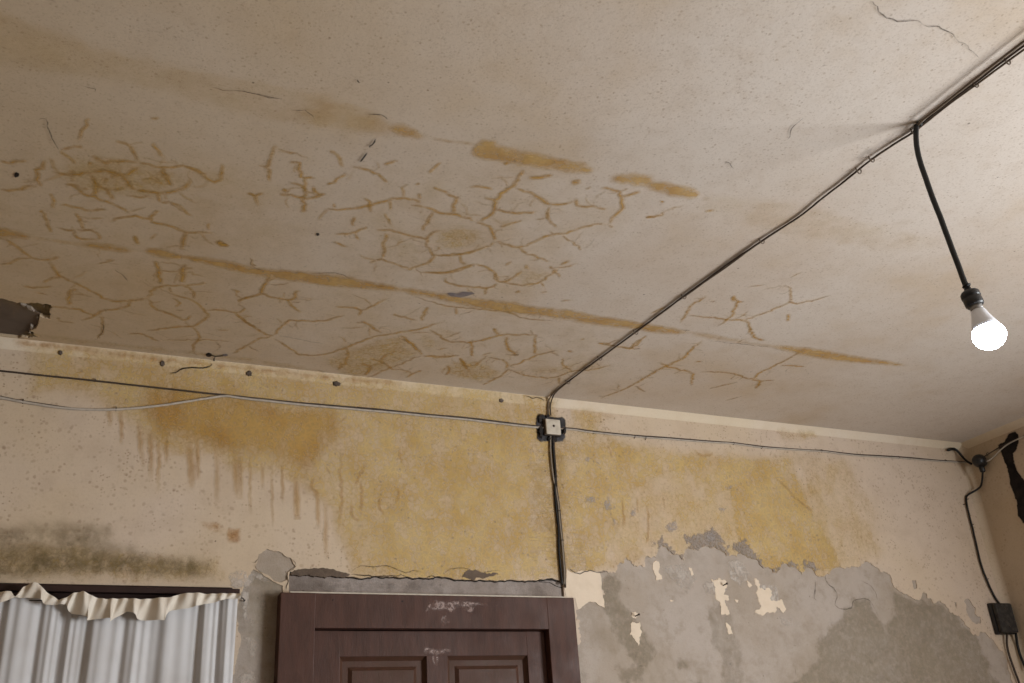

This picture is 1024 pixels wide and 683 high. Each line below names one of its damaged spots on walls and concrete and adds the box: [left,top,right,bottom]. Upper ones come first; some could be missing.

crack [877,6,971,51]
damp [474,142,590,172]
damp [616,177,698,197]
damp [148,250,394,290]
crack [9,114,641,400]
flaking render [25,303,51,315]
damp [410,291,679,333]
crack [620,297,803,391]
damp [785,348,897,365]
damp [40,352,836,580]
peeling [231,549,350,683]
peeling [576,521,1013,683]